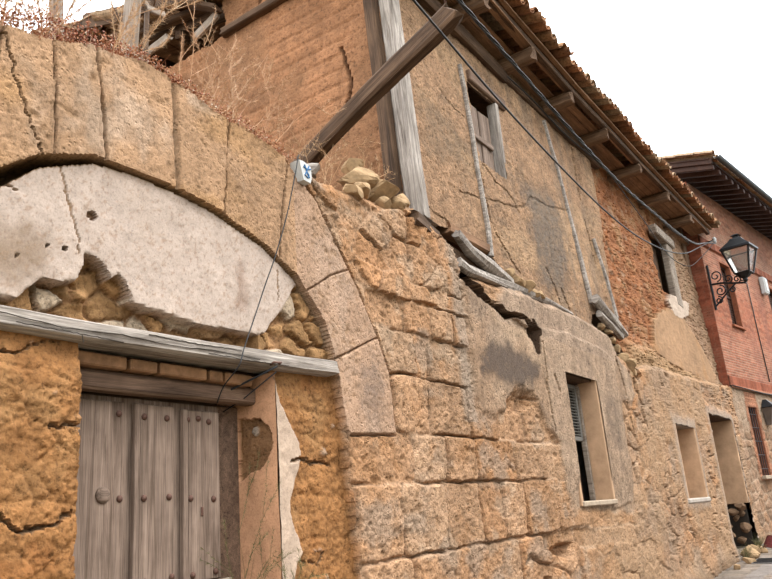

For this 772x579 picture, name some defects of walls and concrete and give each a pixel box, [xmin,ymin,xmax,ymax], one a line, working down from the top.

crack [0,30,332,349]
spalling [0,253,338,364]
crack [459,276,562,432]
crack [459,147,606,274]
peeling [591,167,722,385]